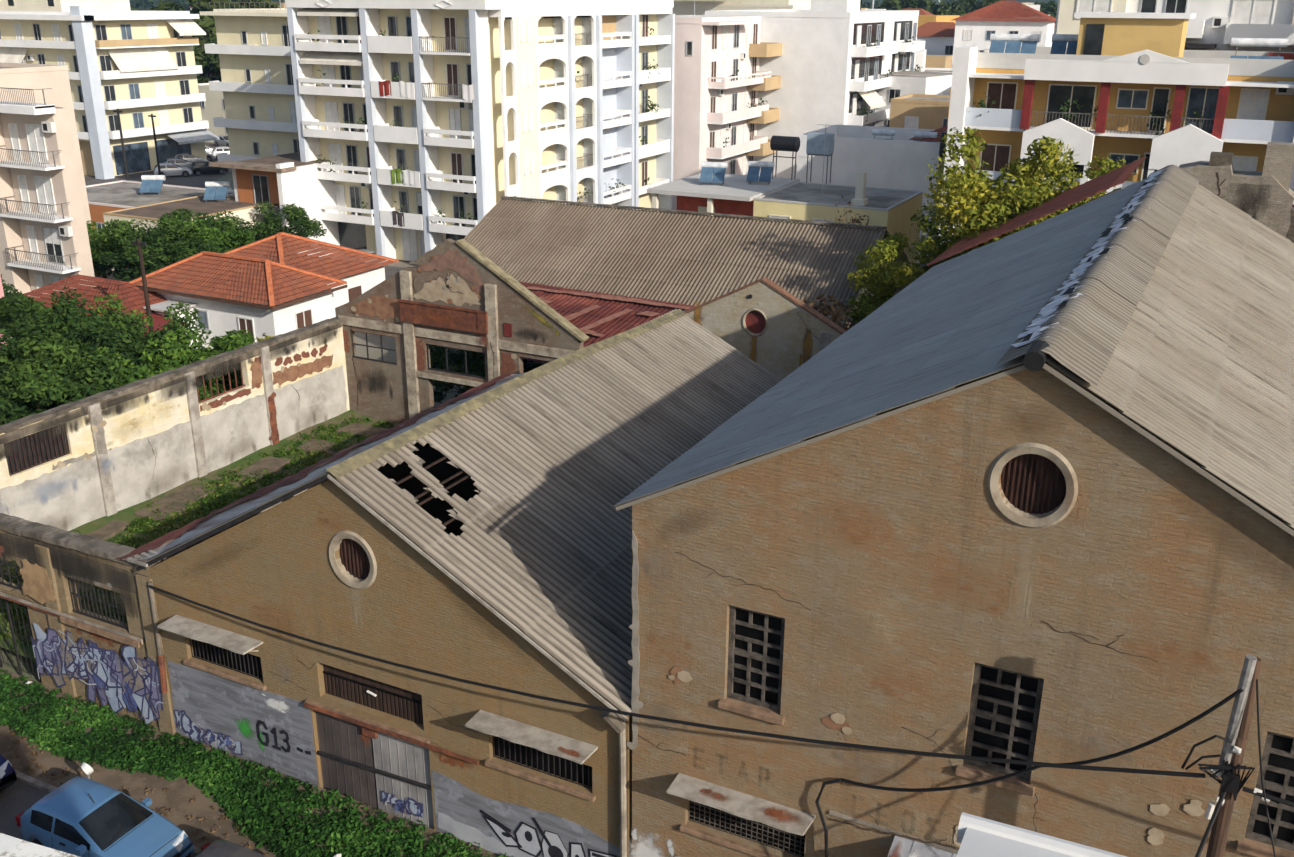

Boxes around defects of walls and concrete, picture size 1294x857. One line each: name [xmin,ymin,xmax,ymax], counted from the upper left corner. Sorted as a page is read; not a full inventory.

peeling [349,248,484,322]
peeling [200,329,351,412]
spalling [415,338,427,371]
crack [675,552,811,610]
crack [1041,621,1157,662]
peeling [630,828,680,857]
rust [700,789,726,801]
rust [766,809,798,822]
spalling [1148,799,1205,845]